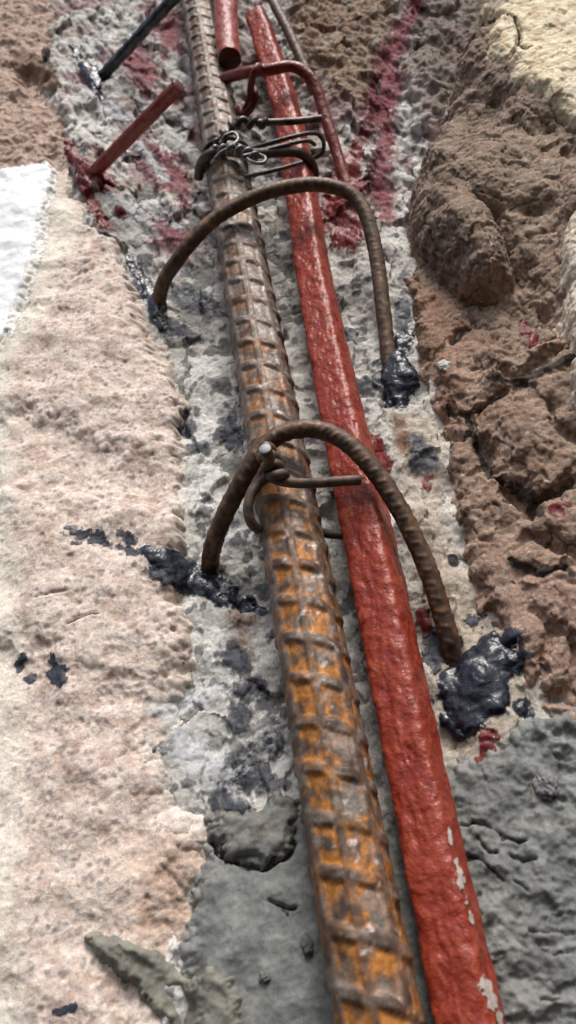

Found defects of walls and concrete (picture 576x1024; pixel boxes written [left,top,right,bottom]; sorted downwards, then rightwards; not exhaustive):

peeling [454,858,474,924]
peeling [477,975,503,1024]